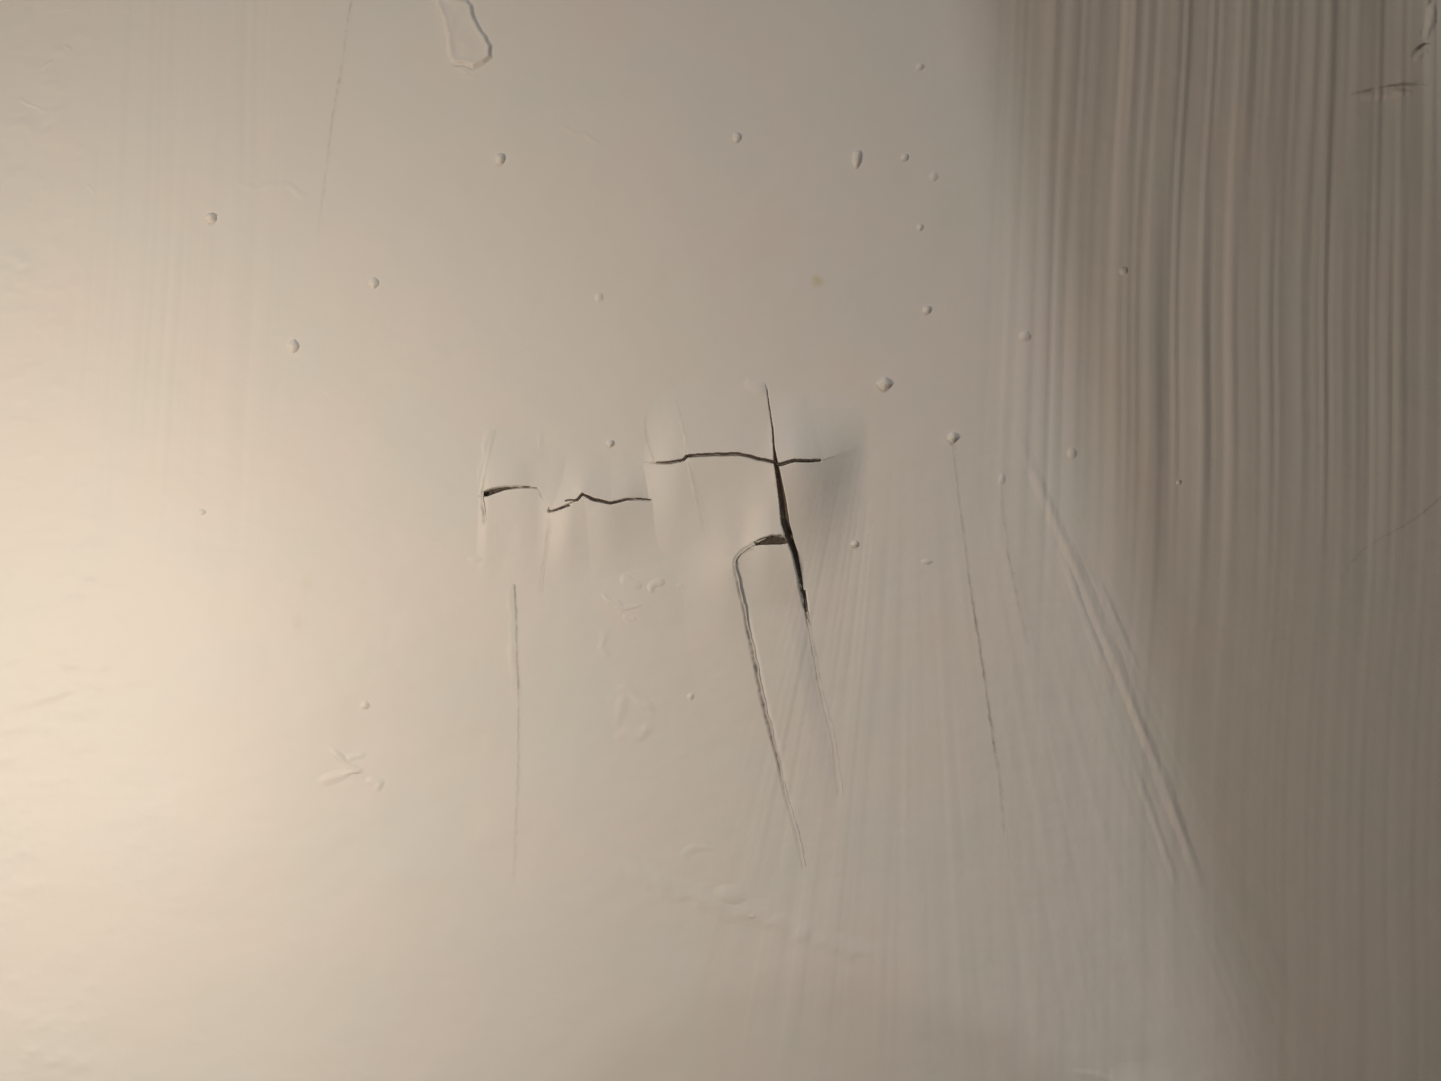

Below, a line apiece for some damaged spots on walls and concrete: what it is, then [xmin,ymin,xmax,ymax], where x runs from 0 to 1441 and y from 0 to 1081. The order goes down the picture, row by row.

crack [467,377,869,883]